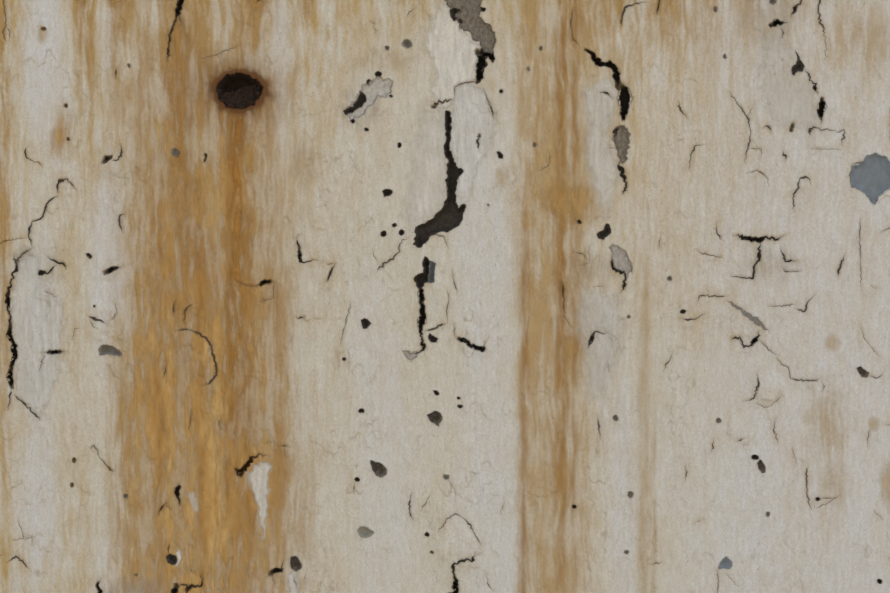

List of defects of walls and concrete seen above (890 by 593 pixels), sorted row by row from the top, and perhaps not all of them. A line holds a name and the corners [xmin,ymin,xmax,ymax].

crack [0,179,74,420]
crack [167,0,184,57]
rust [121,25,287,593]
spalling [343,77,393,119]
crack [373,48,494,354]
peeling [408,0,496,224]
rust [523,82,567,386]
crack [570,11,634,137]
peeling [587,81,630,212]
crack [684,225,825,388]
peeling [849,153,890,204]
crack [440,513,480,593]